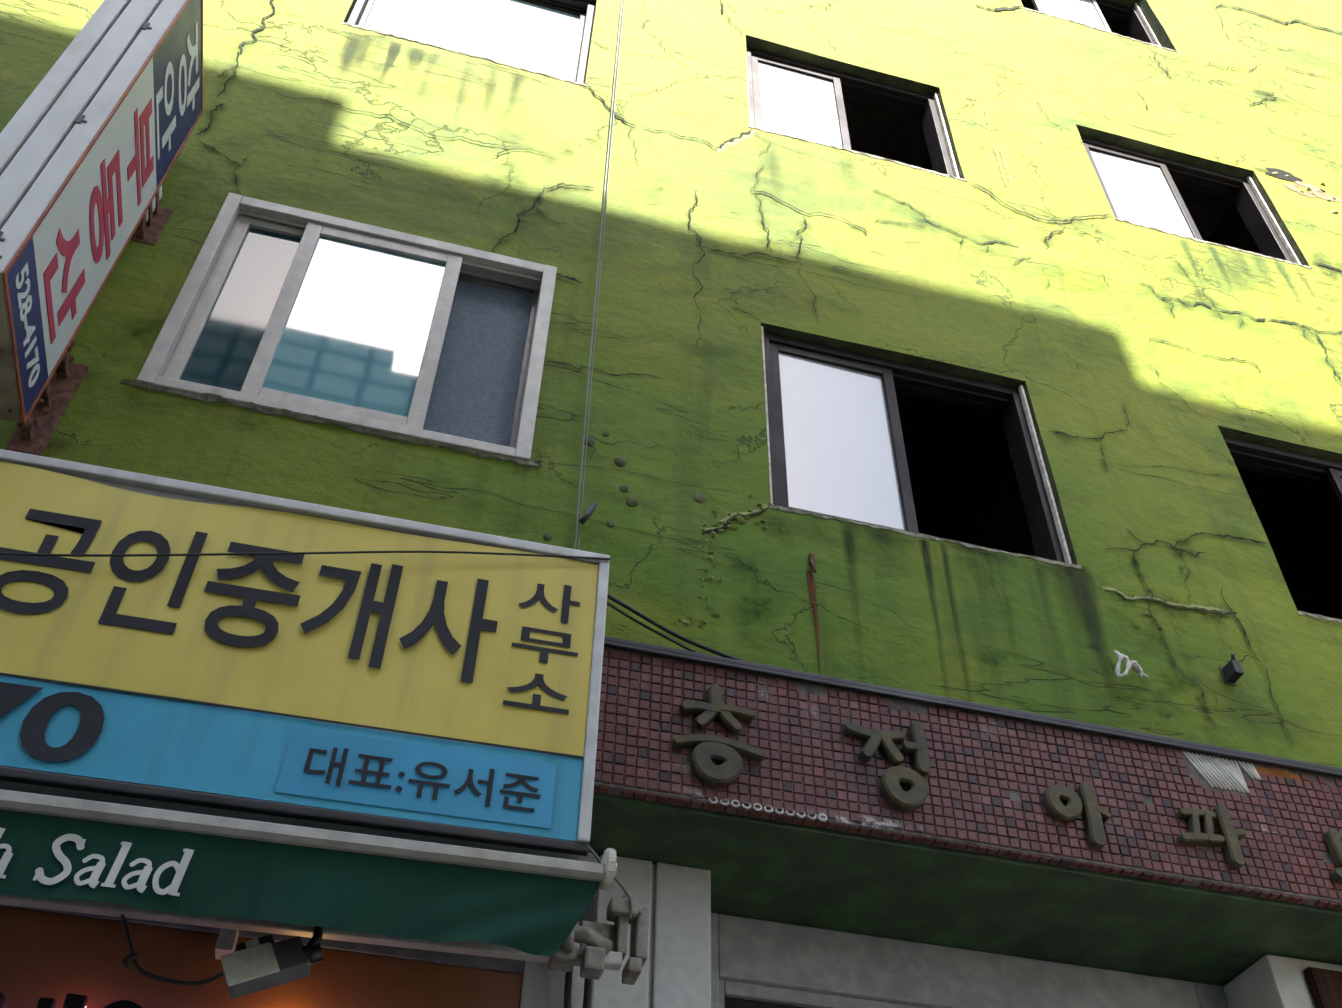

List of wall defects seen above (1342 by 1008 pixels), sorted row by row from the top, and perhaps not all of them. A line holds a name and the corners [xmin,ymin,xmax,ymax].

leakage [344,38,359,63]
leakage [386,43,422,66]
crack [720,0,744,33]
crack [976,4,1023,12]
crack [196,0,594,251]
crack [585,83,1112,347]
crack [547,361,661,379]
crack [1138,259,1342,423]
crack [1049,399,1129,473]
rust [807,553,820,661]
leakage [922,539,952,603]
crack [1102,528,1293,745]